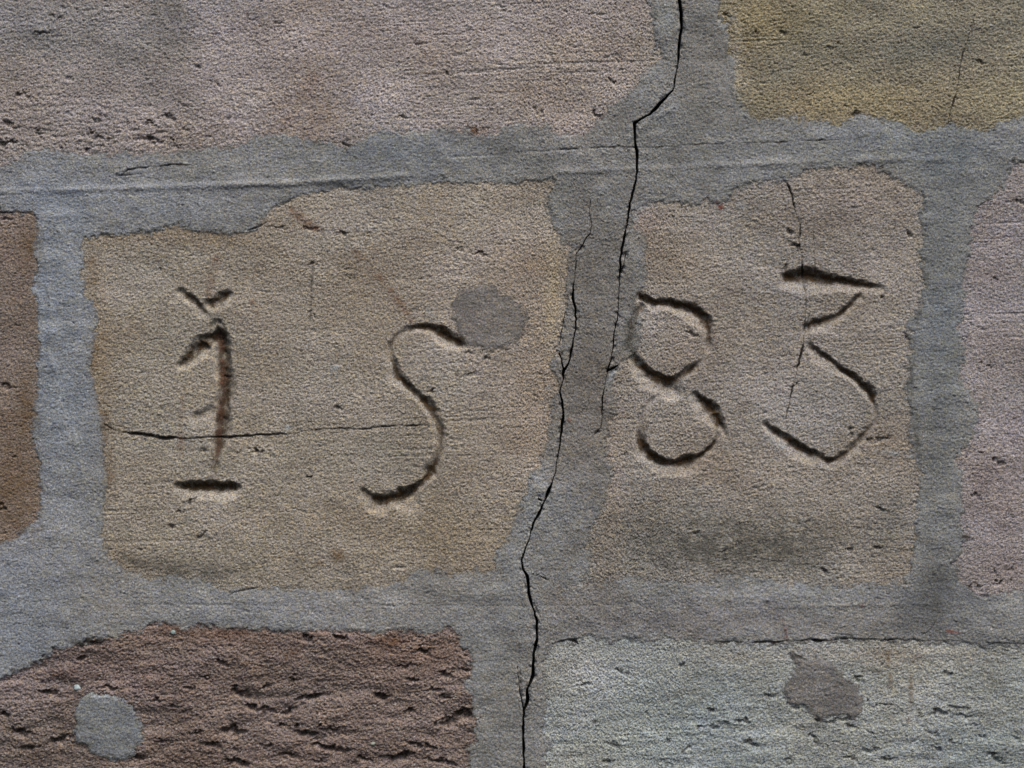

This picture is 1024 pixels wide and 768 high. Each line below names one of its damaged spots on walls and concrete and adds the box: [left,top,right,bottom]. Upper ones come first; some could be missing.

crack [598,0,683,287]
crack [106,424,420,440]
crack [520,236,588,768]
crack [601,313,618,409]